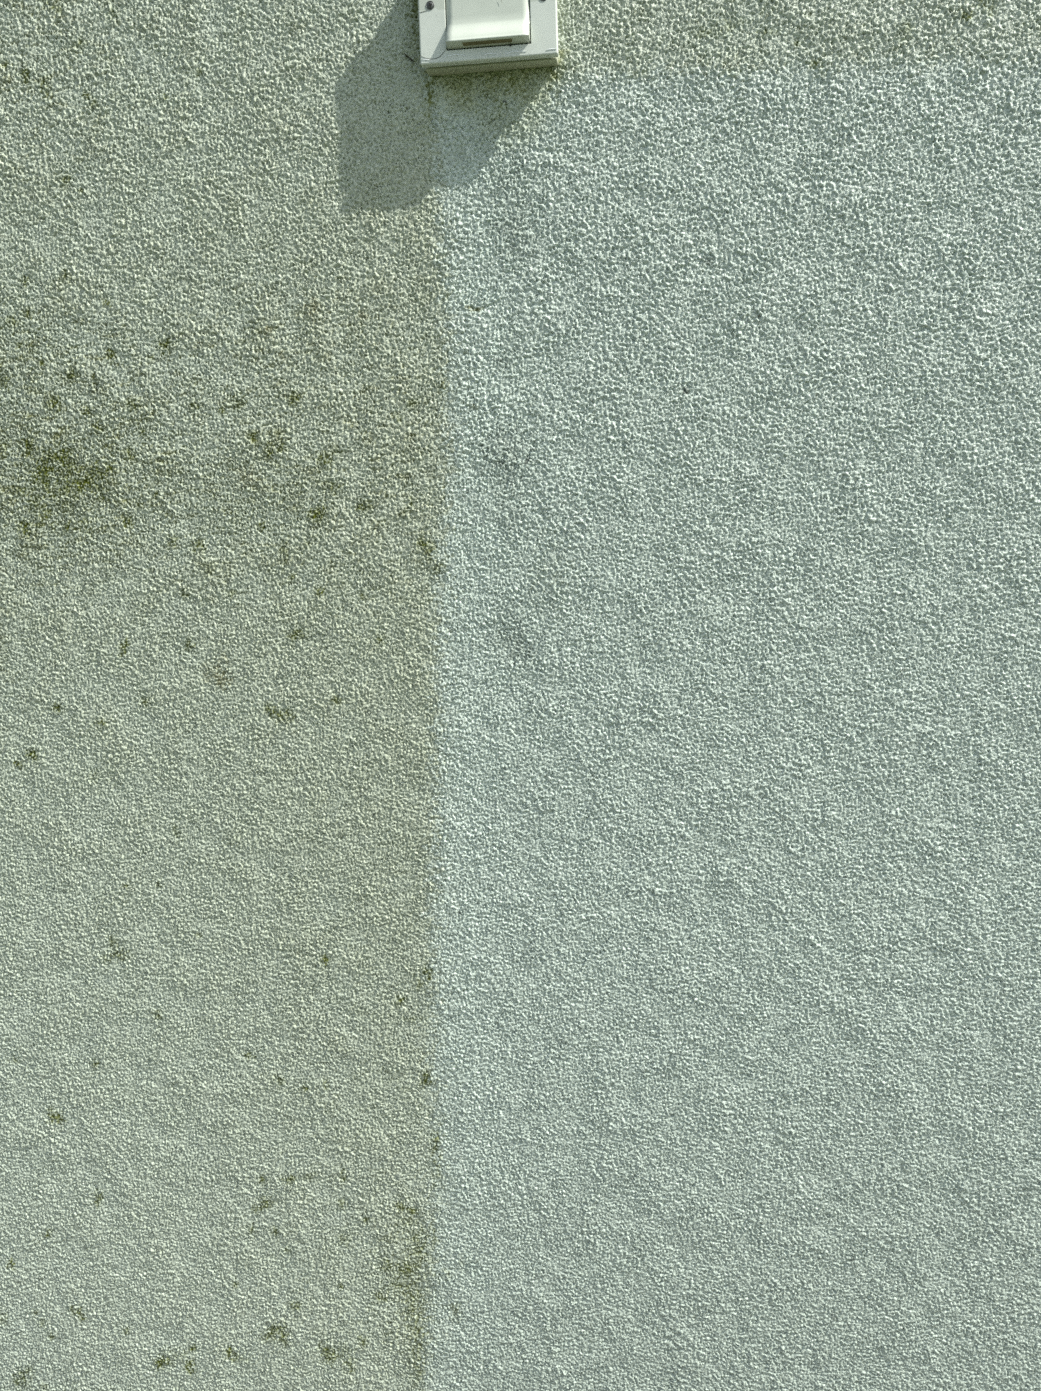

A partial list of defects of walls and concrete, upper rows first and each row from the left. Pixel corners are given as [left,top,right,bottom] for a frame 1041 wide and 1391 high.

leakage [254,288,325,364]
leakage [86,368,100,399]
leakage [229,460,266,494]
leakage [193,648,237,695]
leakage [427,1129,445,1202]
leakage [370,1199,472,1391]